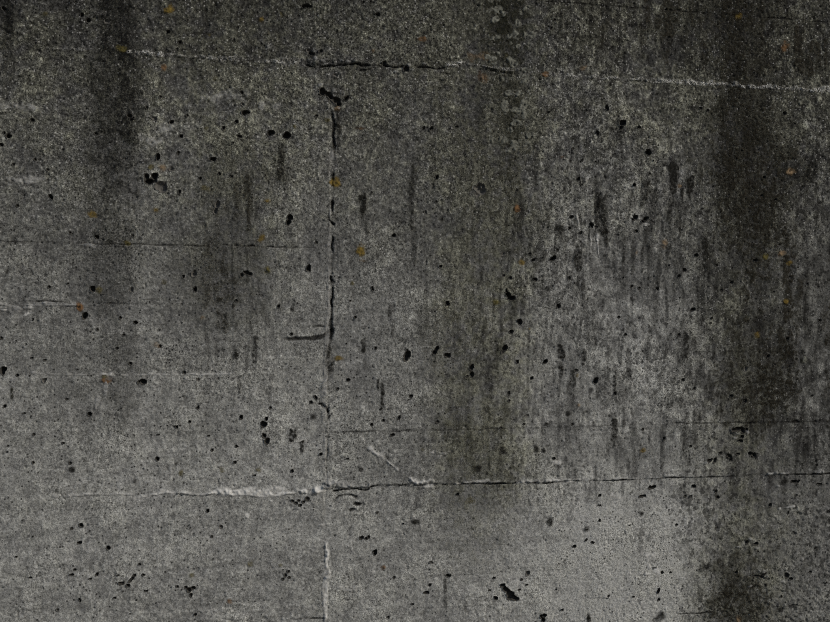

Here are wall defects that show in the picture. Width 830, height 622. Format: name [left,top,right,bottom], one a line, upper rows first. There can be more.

leakage [483,0,530,138]
leakage [595,192,609,255]
leakage [667,0,816,438]
leakage [558,344,576,387]
crack [460,478,566,486]